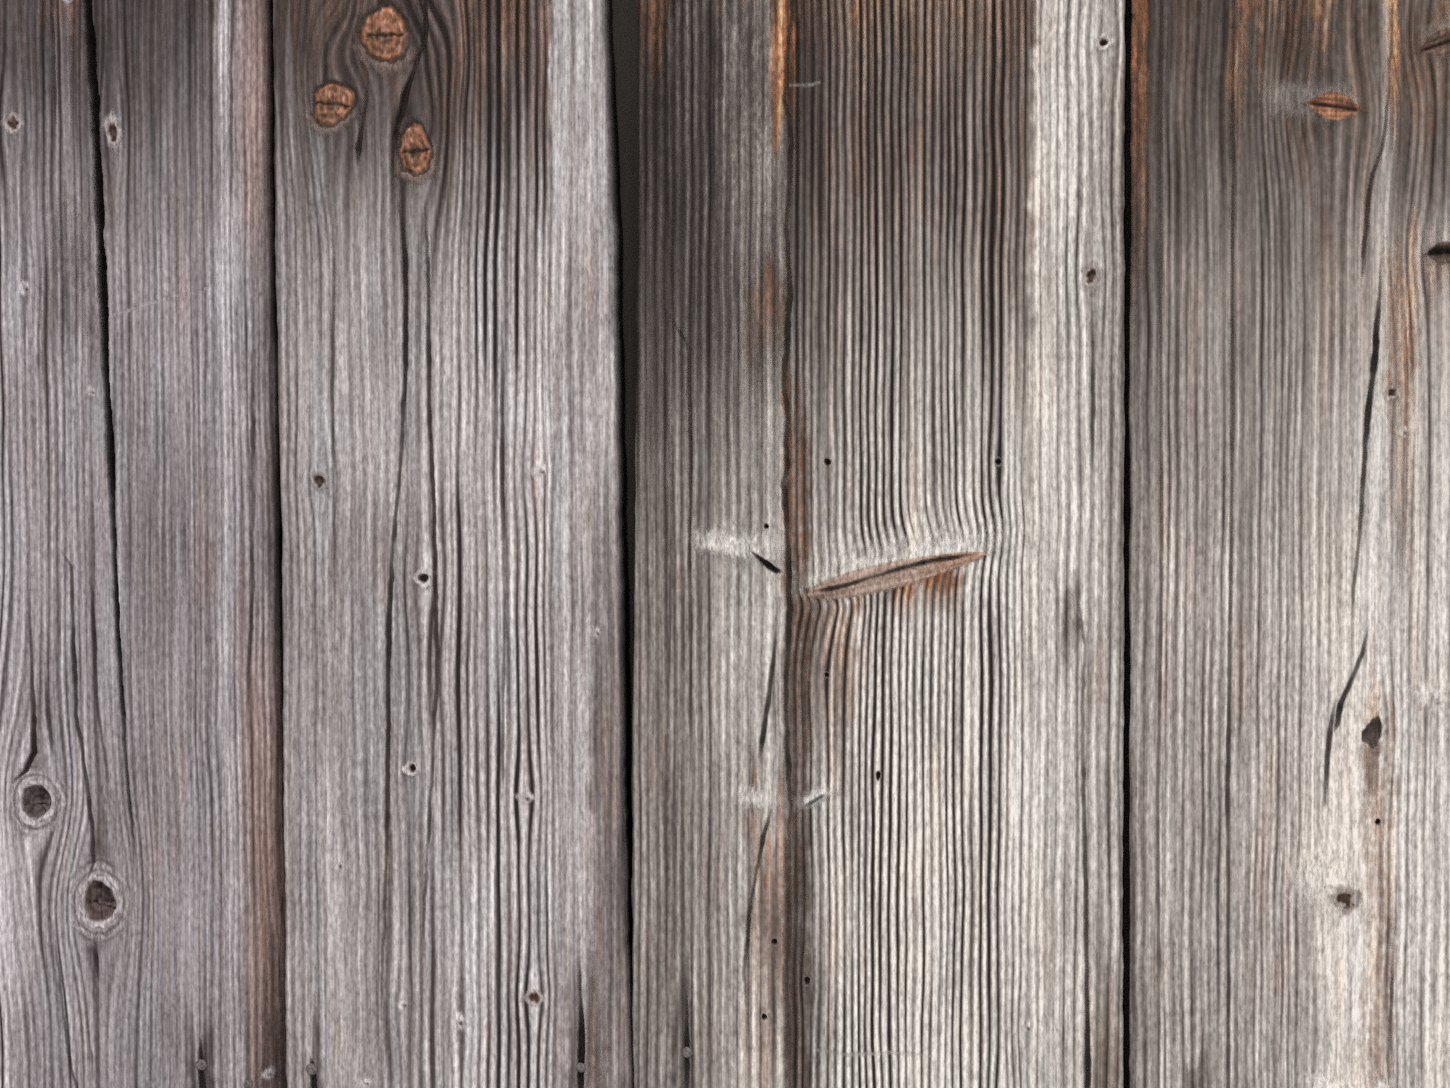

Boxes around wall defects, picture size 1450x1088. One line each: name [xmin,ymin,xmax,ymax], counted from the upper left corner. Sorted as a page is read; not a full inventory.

crack [17,0,133,872]
crack [743,0,961,979]
crack [1324,638,1366,805]